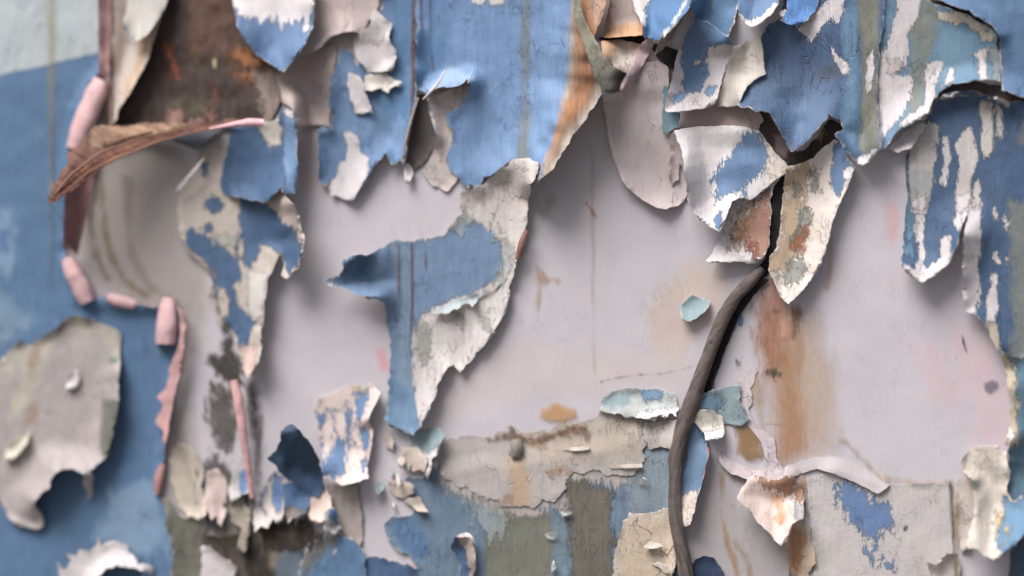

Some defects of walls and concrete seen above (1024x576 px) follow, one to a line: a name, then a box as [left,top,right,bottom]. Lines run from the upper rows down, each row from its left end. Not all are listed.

corrosion [553,8,594,152]
peeling [601,0,1001,304]
peeling [942,0,1024,97]
peeling [0,0,691,576]
peeling [680,295,710,322]
corrosion [738,427,763,460]
corrosion [754,280,822,451]
peeling [682,368,961,576]
peeling [888,90,1024,576]